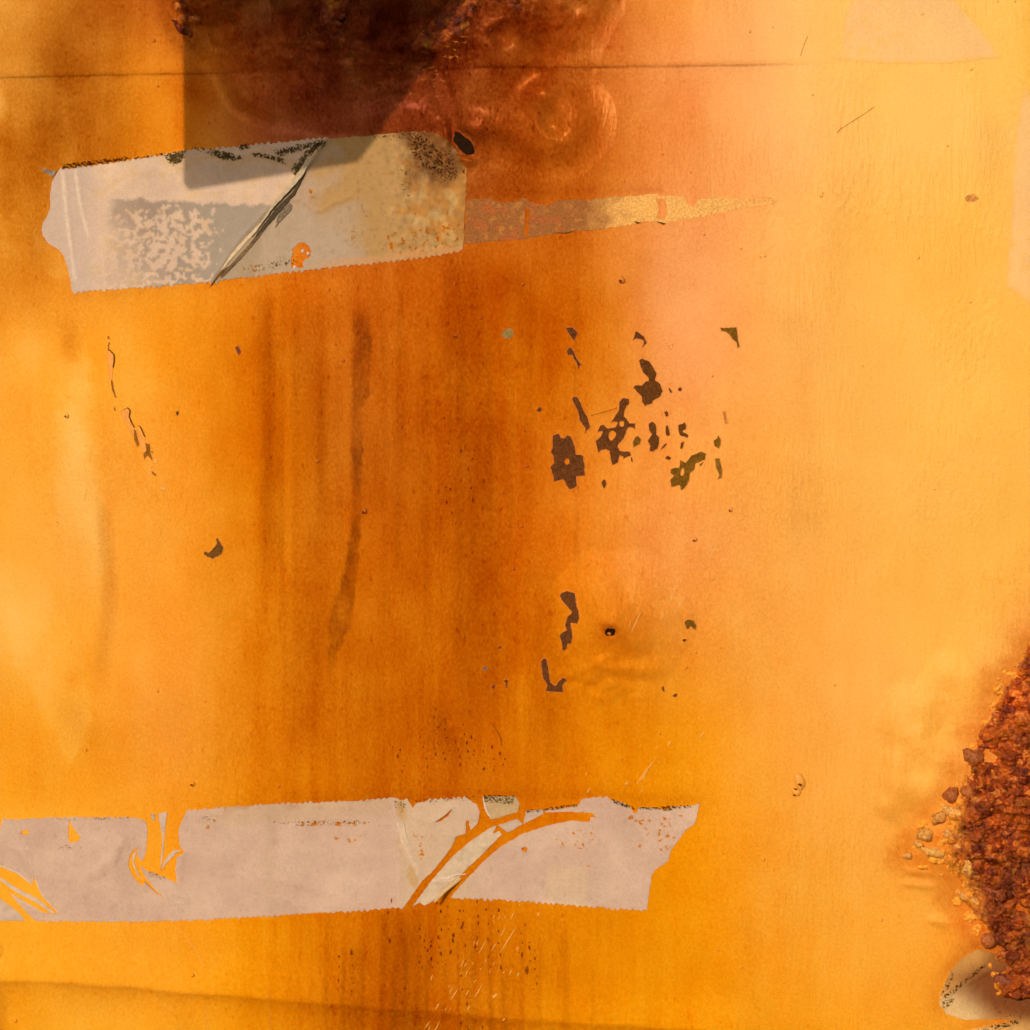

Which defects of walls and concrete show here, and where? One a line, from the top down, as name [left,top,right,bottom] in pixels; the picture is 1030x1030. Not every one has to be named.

rust [160,0,626,199]
peeling [550,326,723,491]
peeling [719,326,740,348]
peeling [203,537,224,560]
rust [214,215,625,1030]
peeling [540,657,567,693]
peeling [559,590,580,652]
rust [902,642,1030,1001]